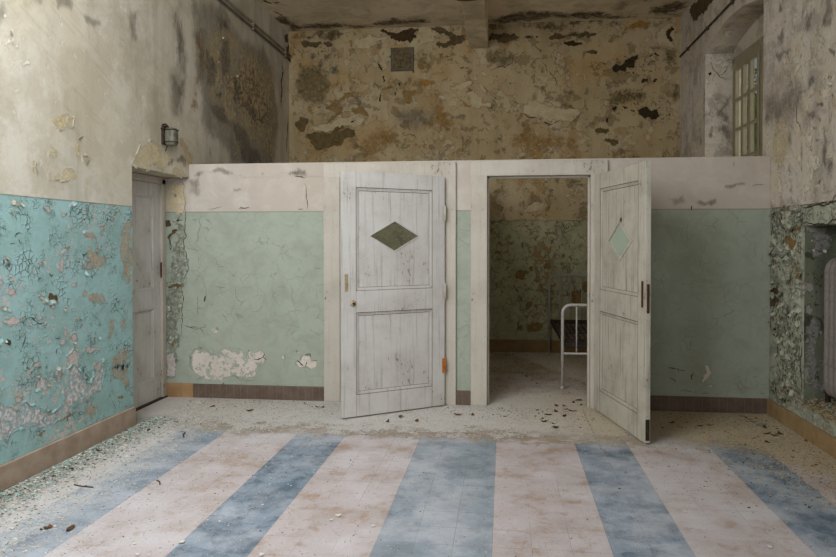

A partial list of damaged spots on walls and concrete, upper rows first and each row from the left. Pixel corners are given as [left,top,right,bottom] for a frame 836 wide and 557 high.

spalling [689,0,714,25]
peeling [355,27,421,52]
spalling [431,26,465,51]
spalling [489,31,538,43]
spalling [549,31,597,54]
spalling [295,91,370,153]
peeling [131,138,192,379]
spalling [37,292,83,321]
peeling [568,280,587,304]
peeling [767,203,832,405]
peeling [188,346,266,383]
peeling [0,319,130,443]